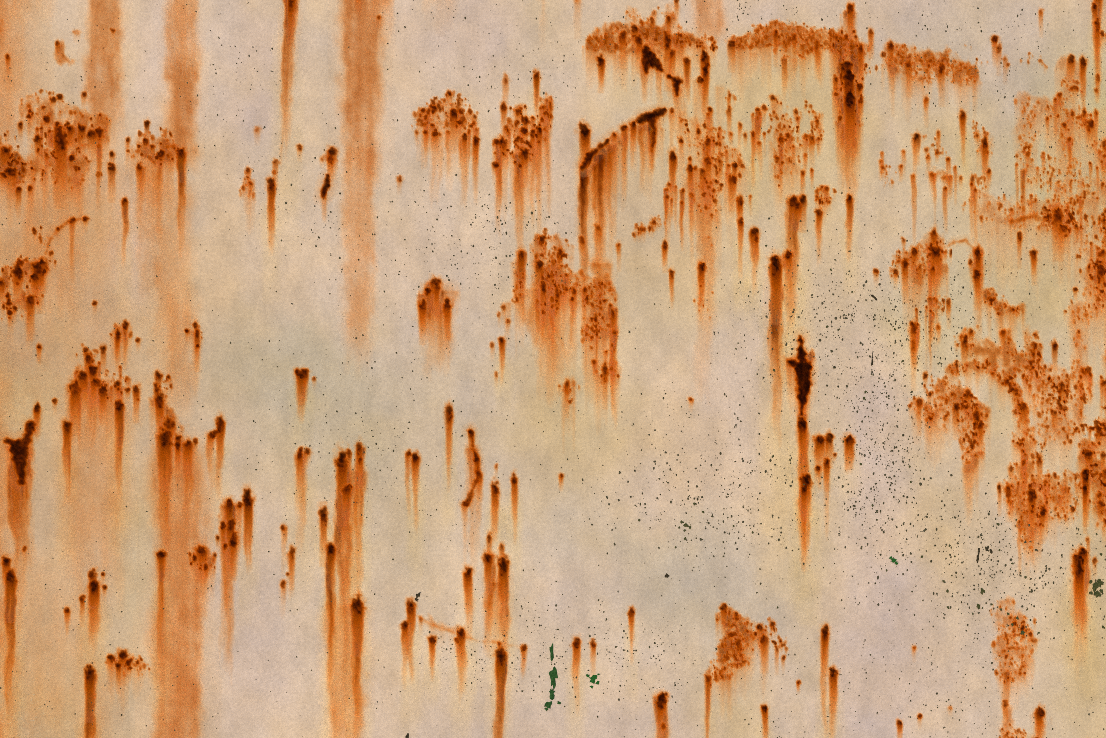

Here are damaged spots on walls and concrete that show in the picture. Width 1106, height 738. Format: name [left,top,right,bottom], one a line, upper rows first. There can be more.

corrosion [0,60,196,203]
corrosion [492,70,553,198]
corrosion [632,91,824,256]
corrosion [586,0,979,160]
corrosion [980,54,1106,347]
corrosion [62,320,140,471]
corrosion [152,370,225,494]
corrosion [497,224,619,382]
corrosion [769,186,855,533]
corrosion [908,328,1106,551]
corrosion [181,488,254,593]
corrosion [318,442,365,684]